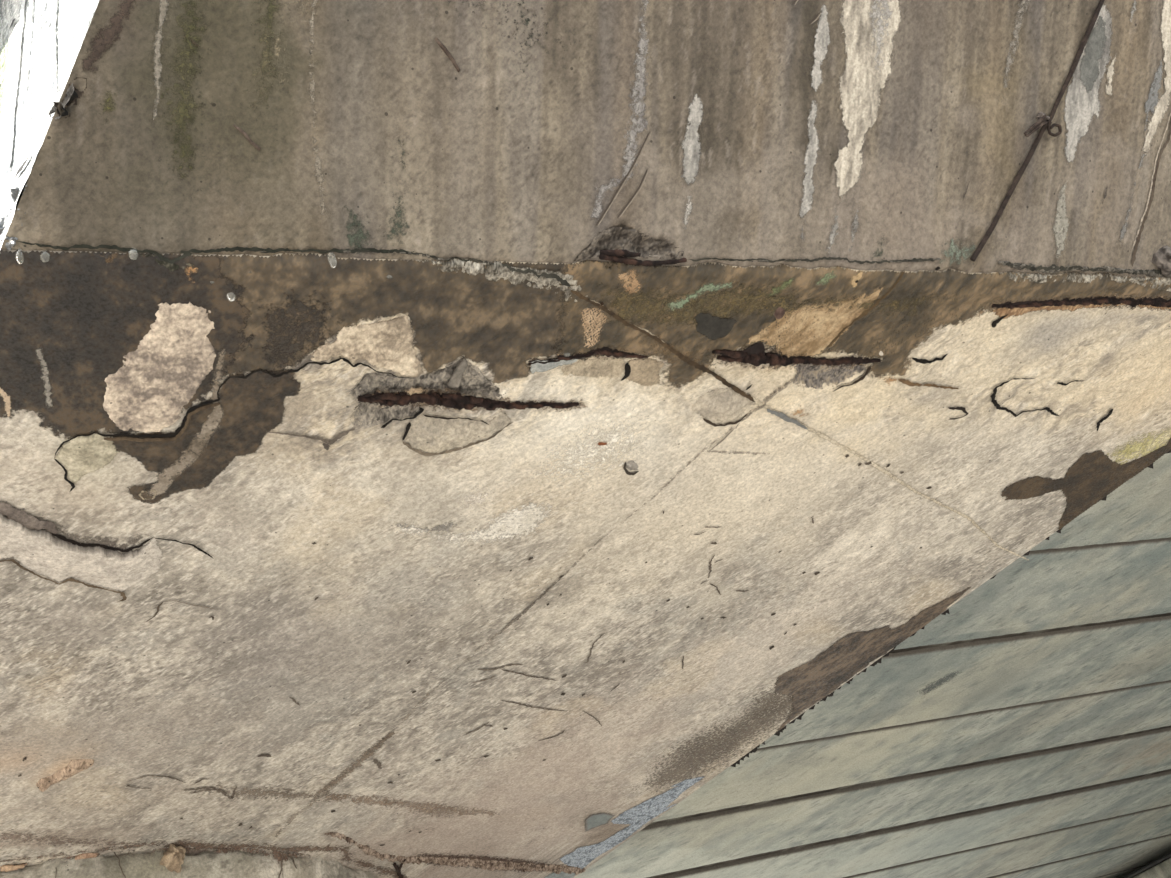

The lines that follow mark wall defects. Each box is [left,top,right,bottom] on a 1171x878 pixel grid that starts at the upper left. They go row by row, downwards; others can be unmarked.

damp [799,0,901,239]
efflorescence [1064,5,1116,162]
efflorescence [1139,0,1171,168]
peeling [55,302,216,484]
crack [55,358,405,491]
spalling [310,315,586,428]
spalling [0,185,941,391]
corrosion [551,260,1171,388]
crack [898,354,1085,420]
spalling [990,261,1171,319]
crack [0,501,214,559]
damp [544,586,972,878]